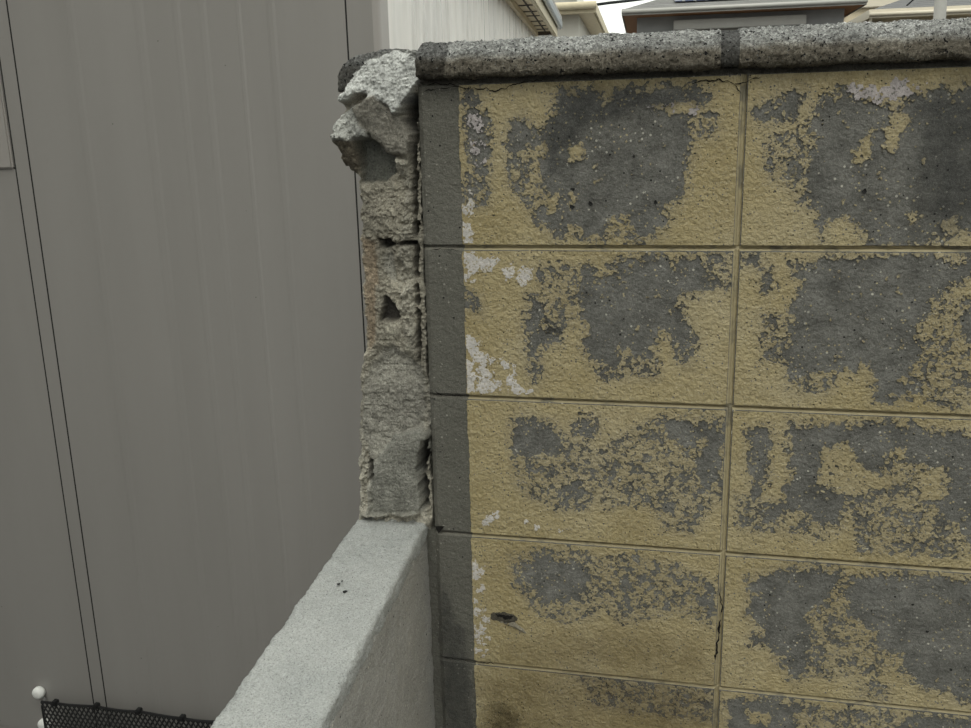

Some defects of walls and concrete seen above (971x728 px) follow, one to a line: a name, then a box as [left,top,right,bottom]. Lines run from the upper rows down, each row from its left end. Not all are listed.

spalling [340,93,367,113]
spalling [354,85,429,392]
peeling [460,78,971,559]
spalling [358,422,435,530]
peeling [504,545,718,629]
crack [714,592,723,659]
peeling [580,562,971,728]